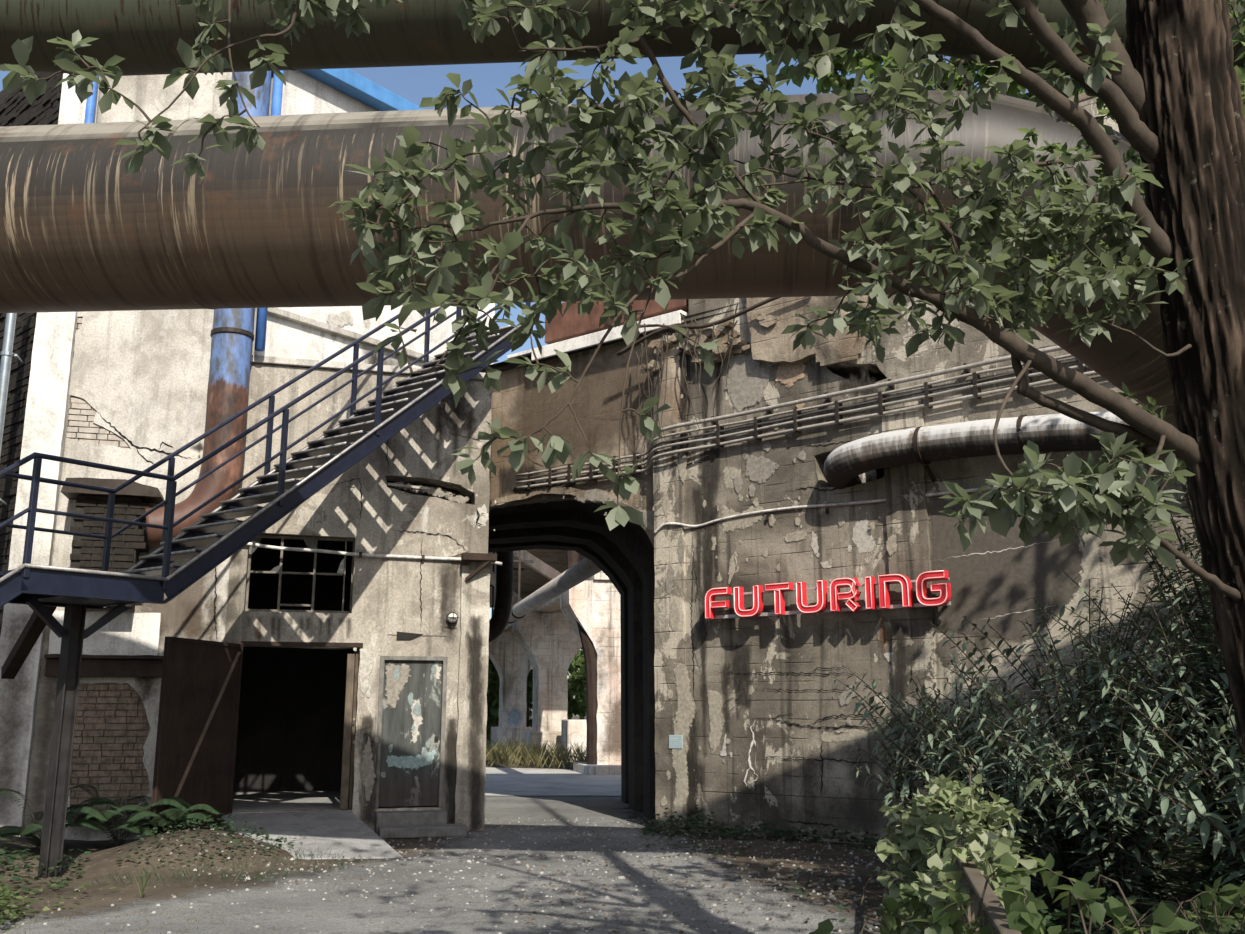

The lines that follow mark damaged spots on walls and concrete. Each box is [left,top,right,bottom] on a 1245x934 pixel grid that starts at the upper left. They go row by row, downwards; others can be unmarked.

spalling [66,395,131,449]
crack [96,411,189,464]
damp [672,348,688,475]
peeling [724,354,806,420]
damp [442,565,456,638]
damp [686,362,722,824]
spalling [70,683,151,828]
peeling [353,645,436,806]
peeling [431,665,442,682]
damp [444,617,483,831]
damp [723,644,751,731]